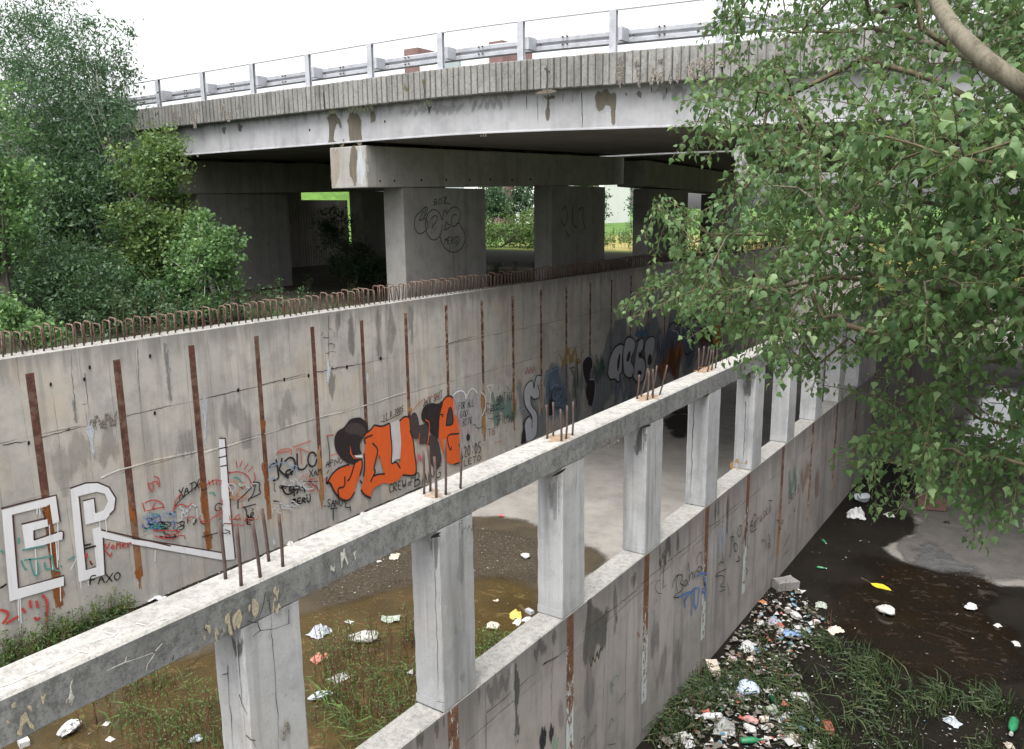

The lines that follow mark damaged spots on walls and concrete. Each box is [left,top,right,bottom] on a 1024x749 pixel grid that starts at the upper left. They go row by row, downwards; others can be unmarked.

water stain [595,89,641,125]
water stain [327,110,386,186]
rust [262,461,270,506]
rust [199,477,211,550]
peeling [203,598,259,642]